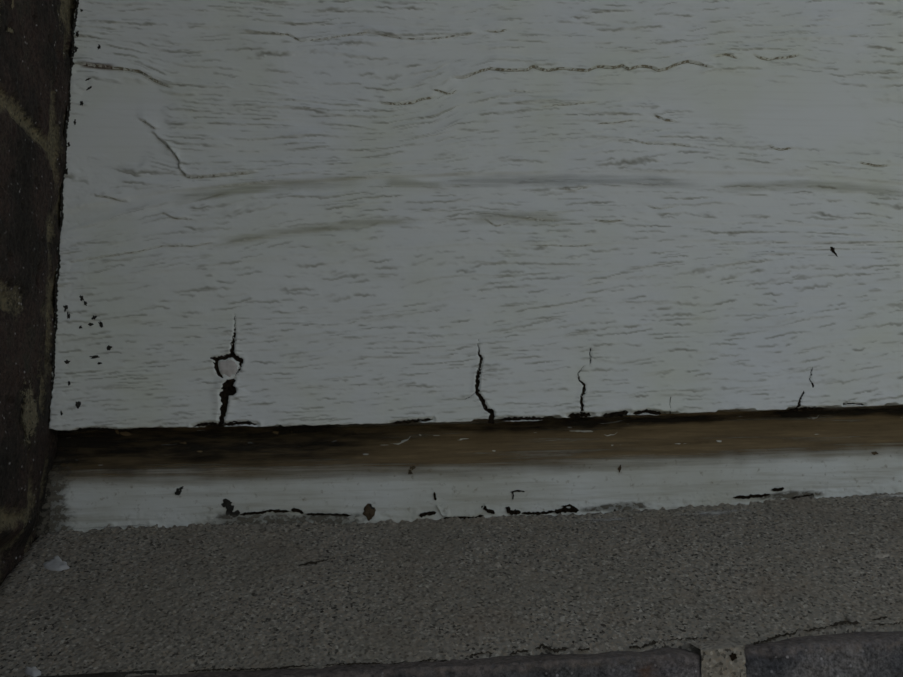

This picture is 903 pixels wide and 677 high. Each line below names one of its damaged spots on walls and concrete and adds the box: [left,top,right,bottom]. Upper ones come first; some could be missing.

crack [388,53,799,105]
crack [210,317,243,426]
crack [466,339,495,424]
crack [578,348,592,415]
damp [53,424,383,465]
damp [480,406,903,431]
peeling [221,499,240,517]
peeling [363,504,376,521]